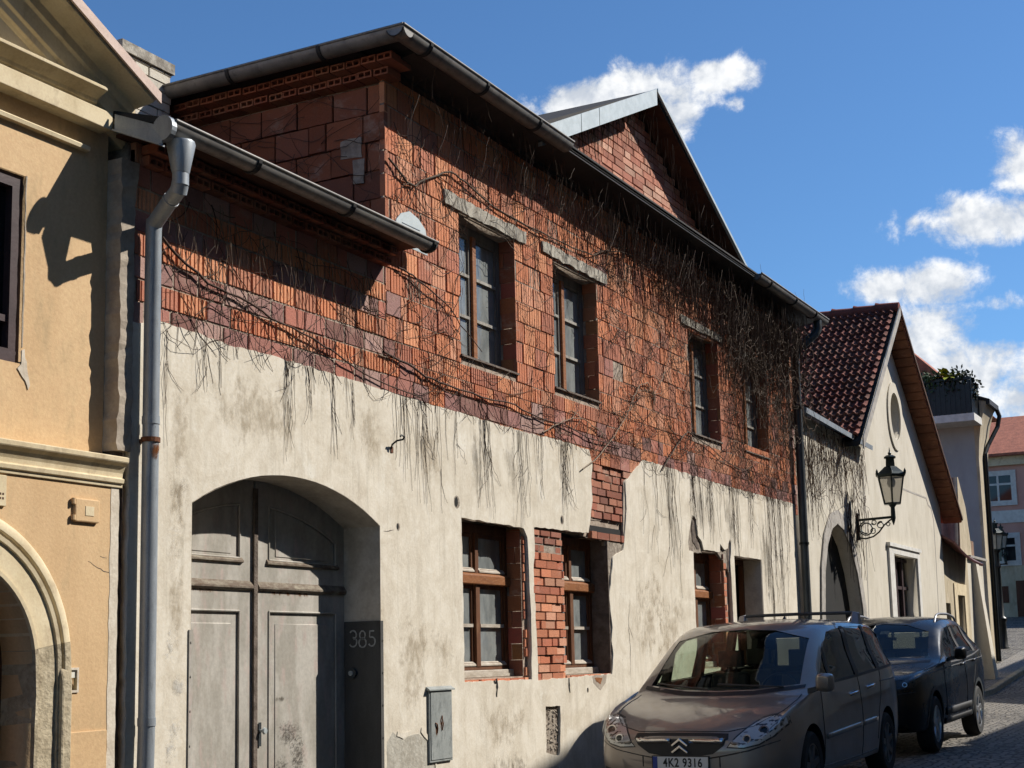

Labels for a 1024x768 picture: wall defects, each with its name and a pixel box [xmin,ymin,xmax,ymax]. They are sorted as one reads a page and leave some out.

spalling [534,516,567,680]
spalling [588,459,638,584]
spalling [688,517,730,573]
spalling [587,653,612,693]